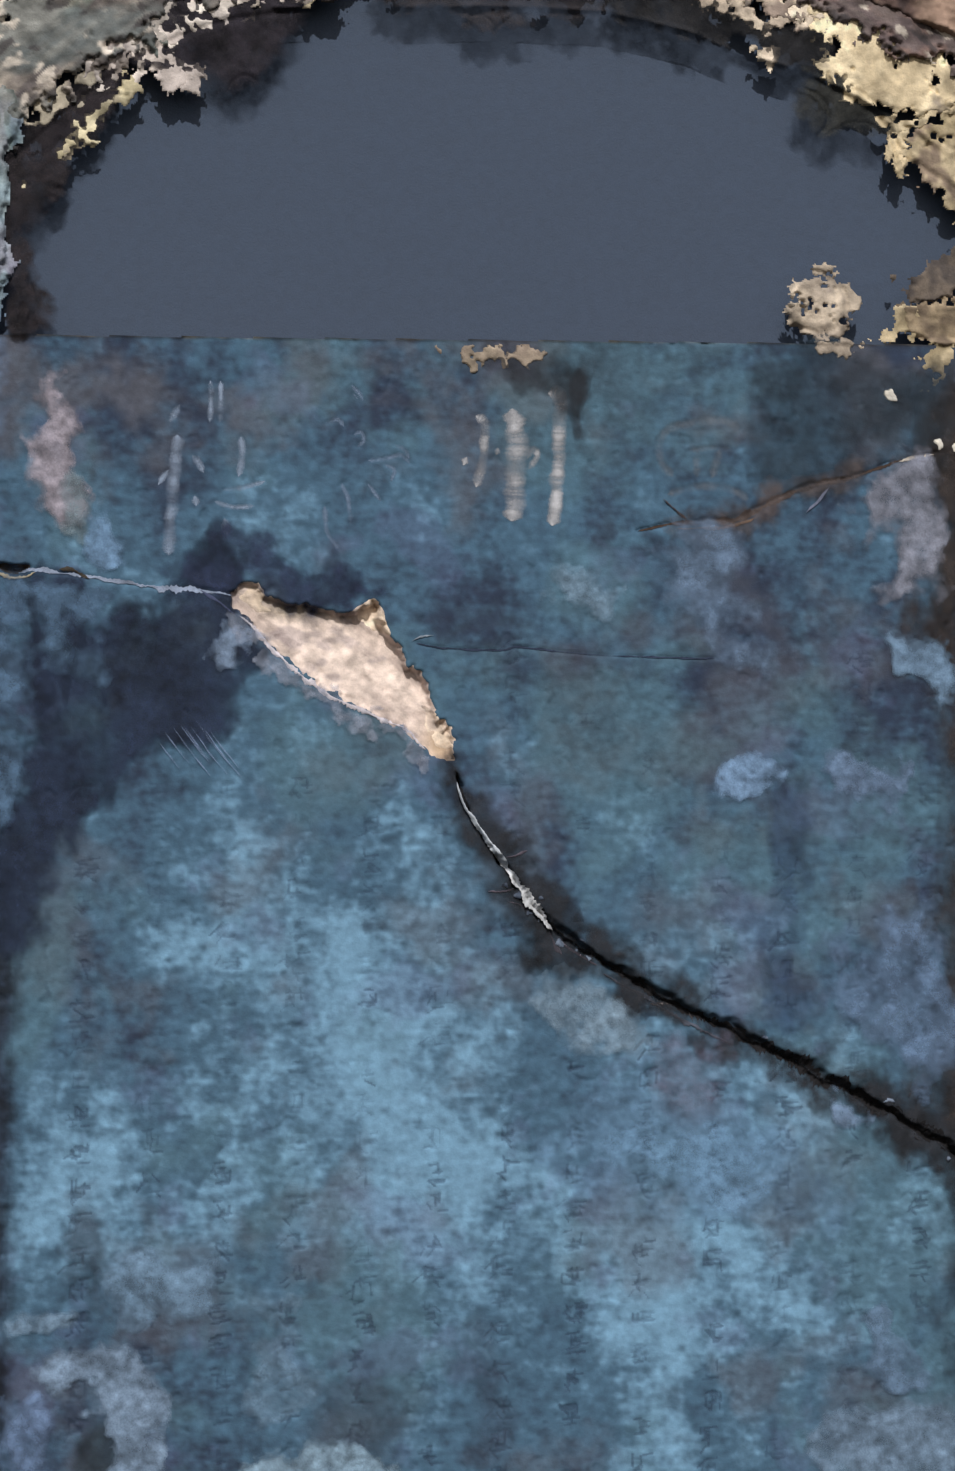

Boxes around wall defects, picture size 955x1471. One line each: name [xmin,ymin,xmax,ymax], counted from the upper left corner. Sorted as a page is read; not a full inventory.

peeling [23,0,316,160]
peeling [699,0,955,225]
peeling [782,262,954,380]
crack [0,563,245,622]
damp [0,379,384,952]
spalling [231,582,456,767]
crack [414,635,713,659]
crack [639,454,934,531]
damp [761,333,955,768]
damp [827,752,914,794]
crack [455,770,955,1161]
damp [832,863,955,1136]